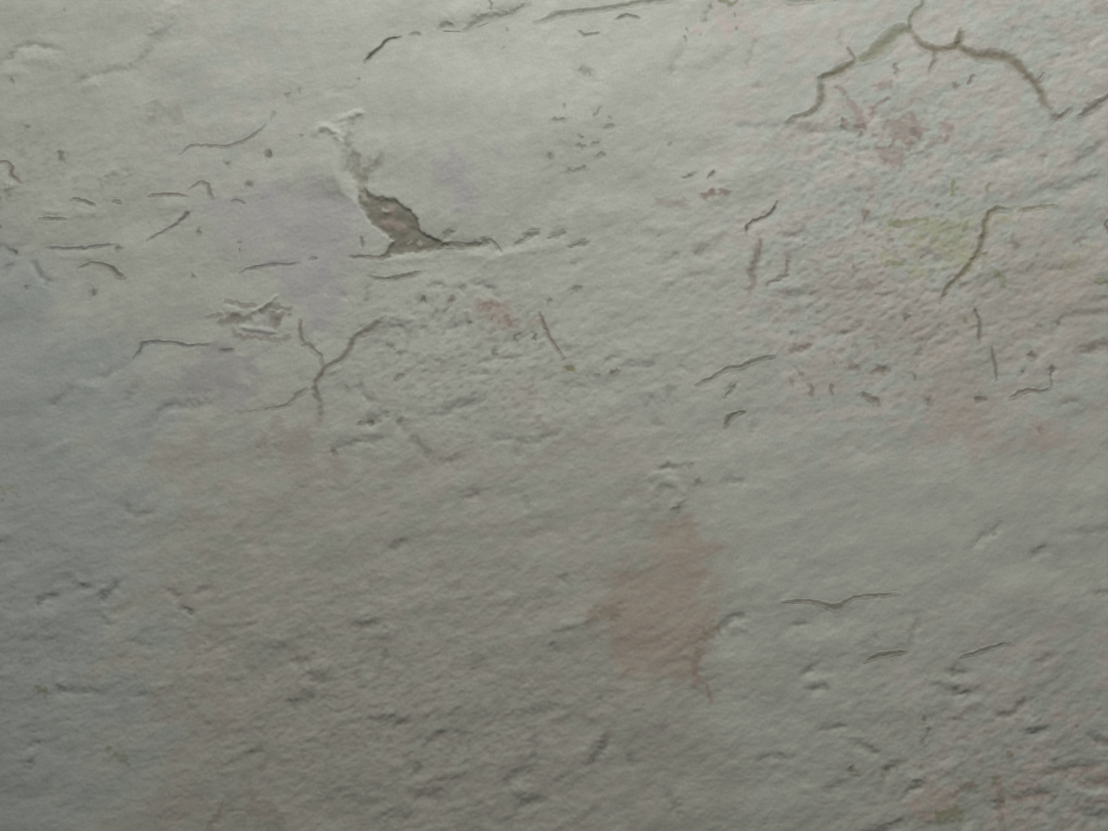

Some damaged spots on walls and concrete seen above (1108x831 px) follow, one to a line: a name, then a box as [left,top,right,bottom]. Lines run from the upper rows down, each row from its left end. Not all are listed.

crack [362,0,680,65]
crack [780,0,1108,125]
peeling [262,107,444,261]
crack [132,338,236,360]
crack [237,255,319,274]
crack [246,312,389,427]
crack [348,228,590,282]
crack [537,309,566,360]
crack [937,203,1060,401]
water stain [577,503,743,705]